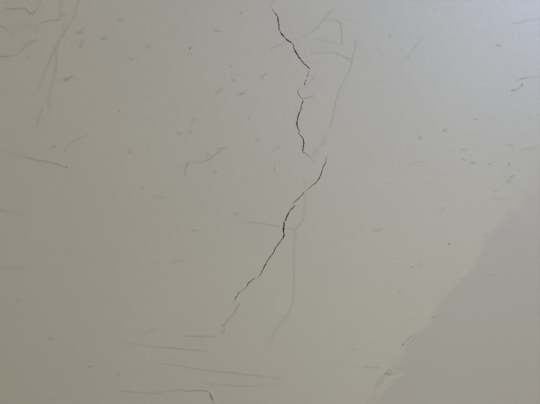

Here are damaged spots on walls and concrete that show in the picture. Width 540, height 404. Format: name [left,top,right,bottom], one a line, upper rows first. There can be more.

crack [118,0,335,352]